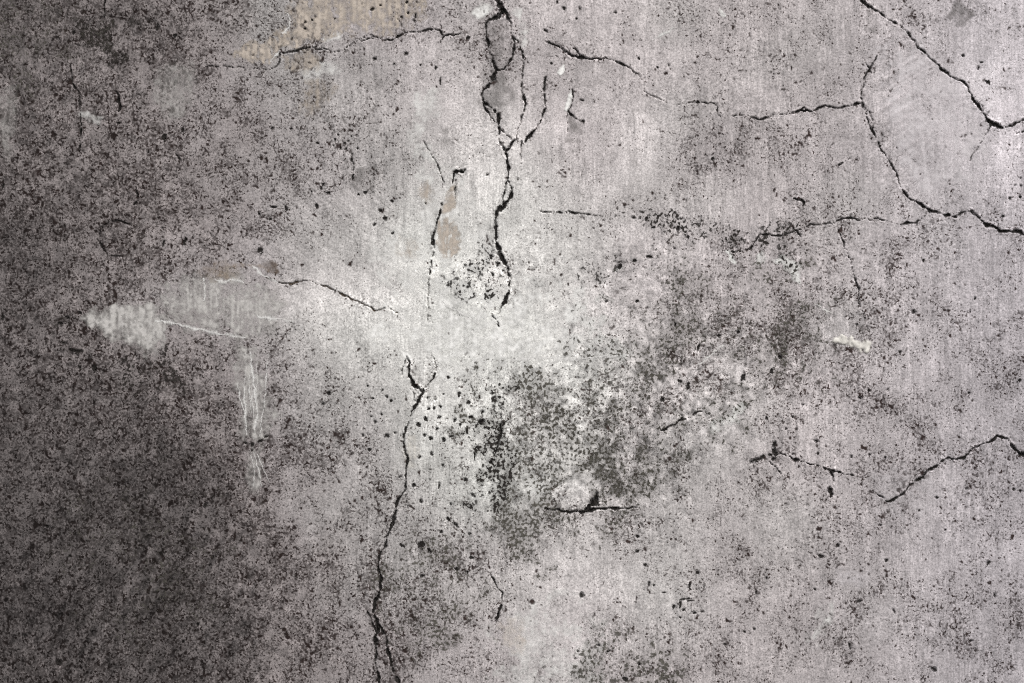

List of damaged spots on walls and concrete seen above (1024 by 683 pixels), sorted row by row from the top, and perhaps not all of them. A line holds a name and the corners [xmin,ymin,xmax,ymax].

crack [546,41,661,100]
crack [860,0,1024,159]
crack [266,0,584,326]
crack [688,55,1024,318]
crack [367,359,436,683]
crack [546,493,636,514]
crack [770,453,854,497]
crack [877,435,1024,502]